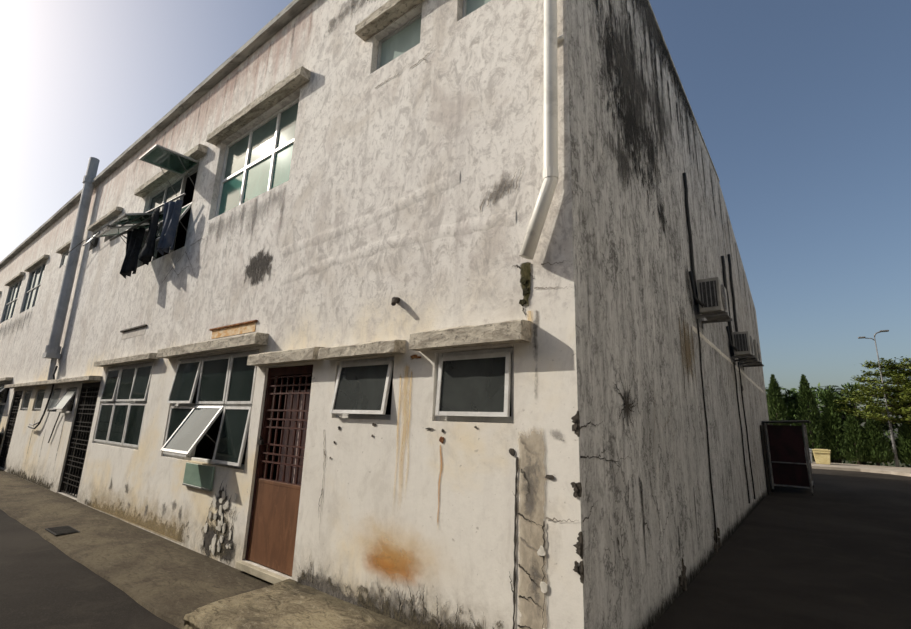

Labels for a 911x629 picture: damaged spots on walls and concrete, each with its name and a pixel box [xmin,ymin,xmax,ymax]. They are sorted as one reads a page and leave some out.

water stain [596,0,758,342]
water stain [243,249,272,285]
water stain [8,468,54,490]
crack [580,320,687,571]
water stain [84,499,189,543]
peeling [201,481,237,564]
corrosion [373,547,412,579]
water stain [297,556,502,629]
crack [509,448,519,629]